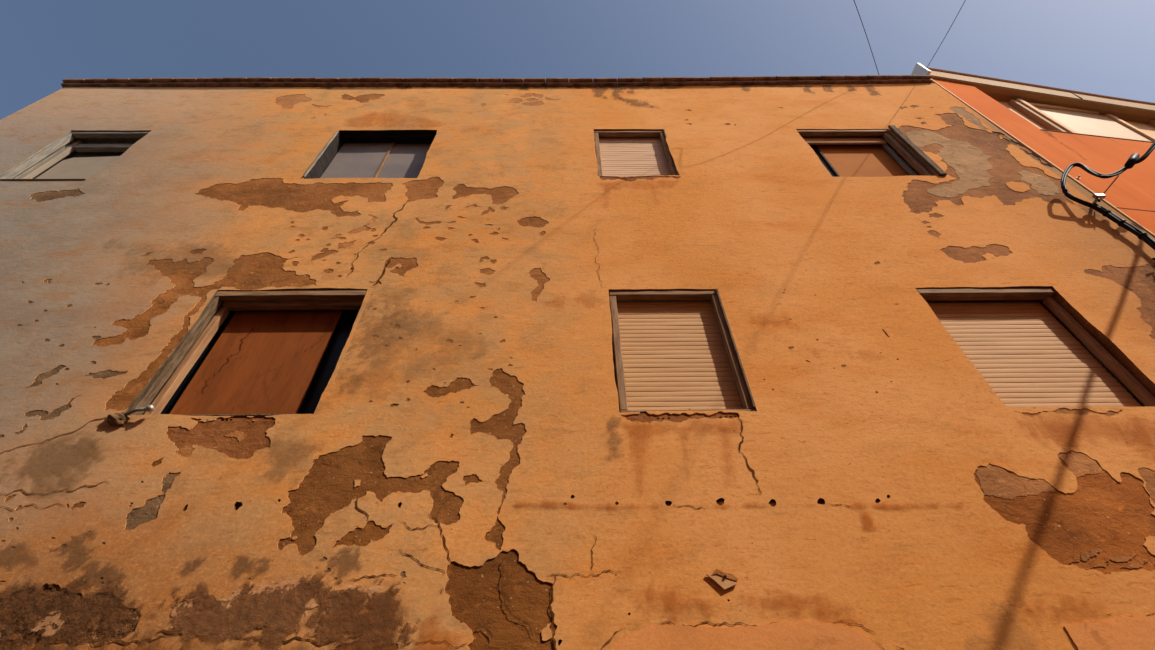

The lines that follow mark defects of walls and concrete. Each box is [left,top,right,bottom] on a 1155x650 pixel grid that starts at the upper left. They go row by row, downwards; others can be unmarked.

peeling [85,177,519,411]
crack [348,200,408,285]
peeling [517,216,549,236]
flaking render [888,105,1075,263]
peeling [1084,264,1155,339]
peeling [0,395,81,438]
flaking render [125,416,275,530]
peeling [160,357,562,650]
crack [738,417,762,493]
flaking render [974,450,1155,575]
flaking render [0,583,141,650]
crack [400,536,619,650]